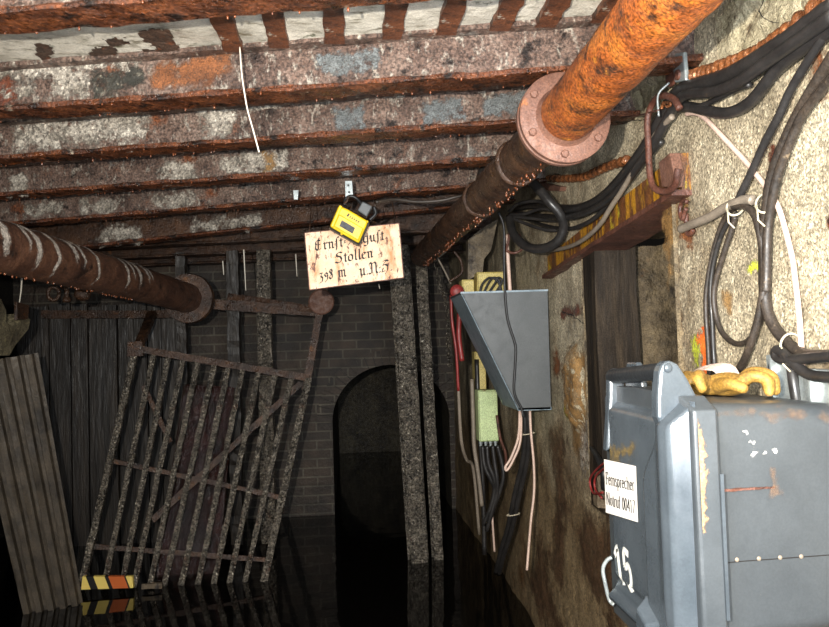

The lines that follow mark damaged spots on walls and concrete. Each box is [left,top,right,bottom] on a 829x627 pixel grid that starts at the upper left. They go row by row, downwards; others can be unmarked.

rust [0,75,18,106]
rust [150,54,231,89]
rust [426,131,542,266]
leakage [529,429,568,627]
leakage [579,511,622,627]